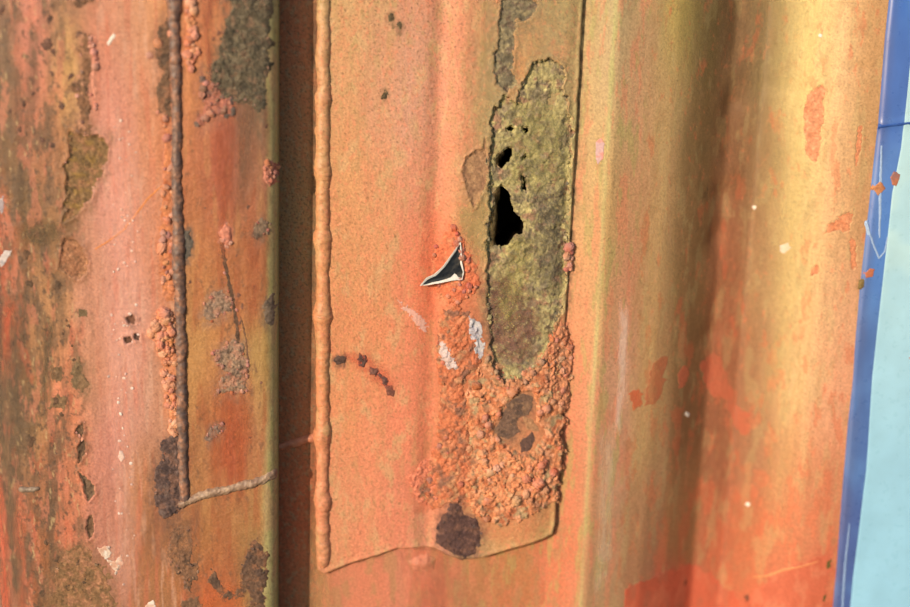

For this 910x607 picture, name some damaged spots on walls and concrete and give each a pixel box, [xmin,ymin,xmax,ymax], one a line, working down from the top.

rust [67,0,93,8]
rust [40,37,56,57]
rust [68,31,101,136]
rust [181,0,280,128]
peeling [803,85,827,163]
rust [146,17,181,519]
rust [406,0,577,560]
rust [47,394,67,417]
rust [48,357,90,393]
rust [211,339,250,395]
rust [39,545,121,607]
rust [165,525,270,607]